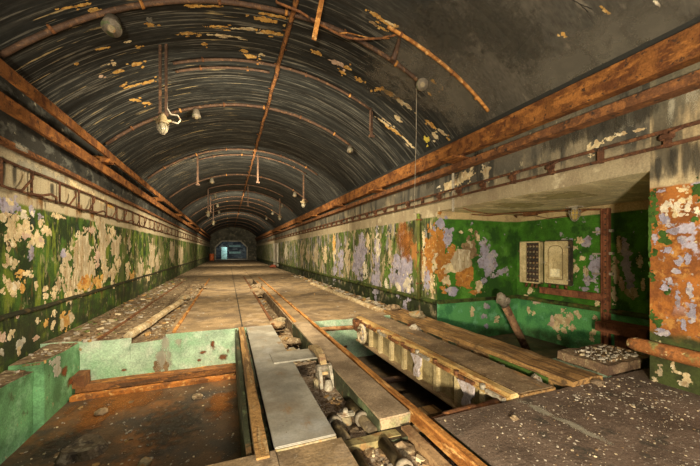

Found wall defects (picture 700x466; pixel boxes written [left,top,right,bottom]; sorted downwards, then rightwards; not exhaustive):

peeling [176,12,289,48]
spalling [437,164,491,192]
damp [544,104,656,150]
spalling [587,128,645,158]
damp [670,142,700,174]
peeling [0,195,184,333]
peeling [300,226,414,310]
peeling [421,211,509,299]
peeling [561,227,601,306]
peeling [611,177,700,331]
peeling [0,329,40,357]
peeling [652,361,692,387]